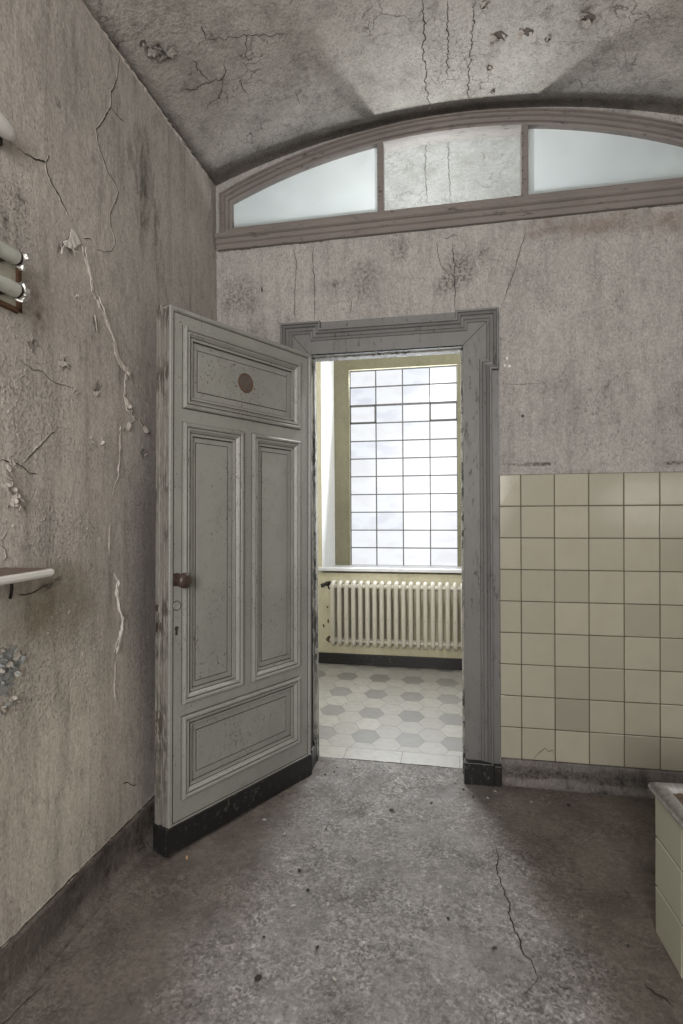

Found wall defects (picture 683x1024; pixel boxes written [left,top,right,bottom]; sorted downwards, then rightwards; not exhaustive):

crack [181,26,287,103]
crack [421,0,476,109]
flaking render [489,27,551,48]
flaking render [56,229,82,255]
crack [18,1,212,493]
flaking render [1,456,25,511]
crack [0,430,56,475]
flaking render [113,573,124,705]
spalling [0,645,27,716]
crack [495,845,568,993]